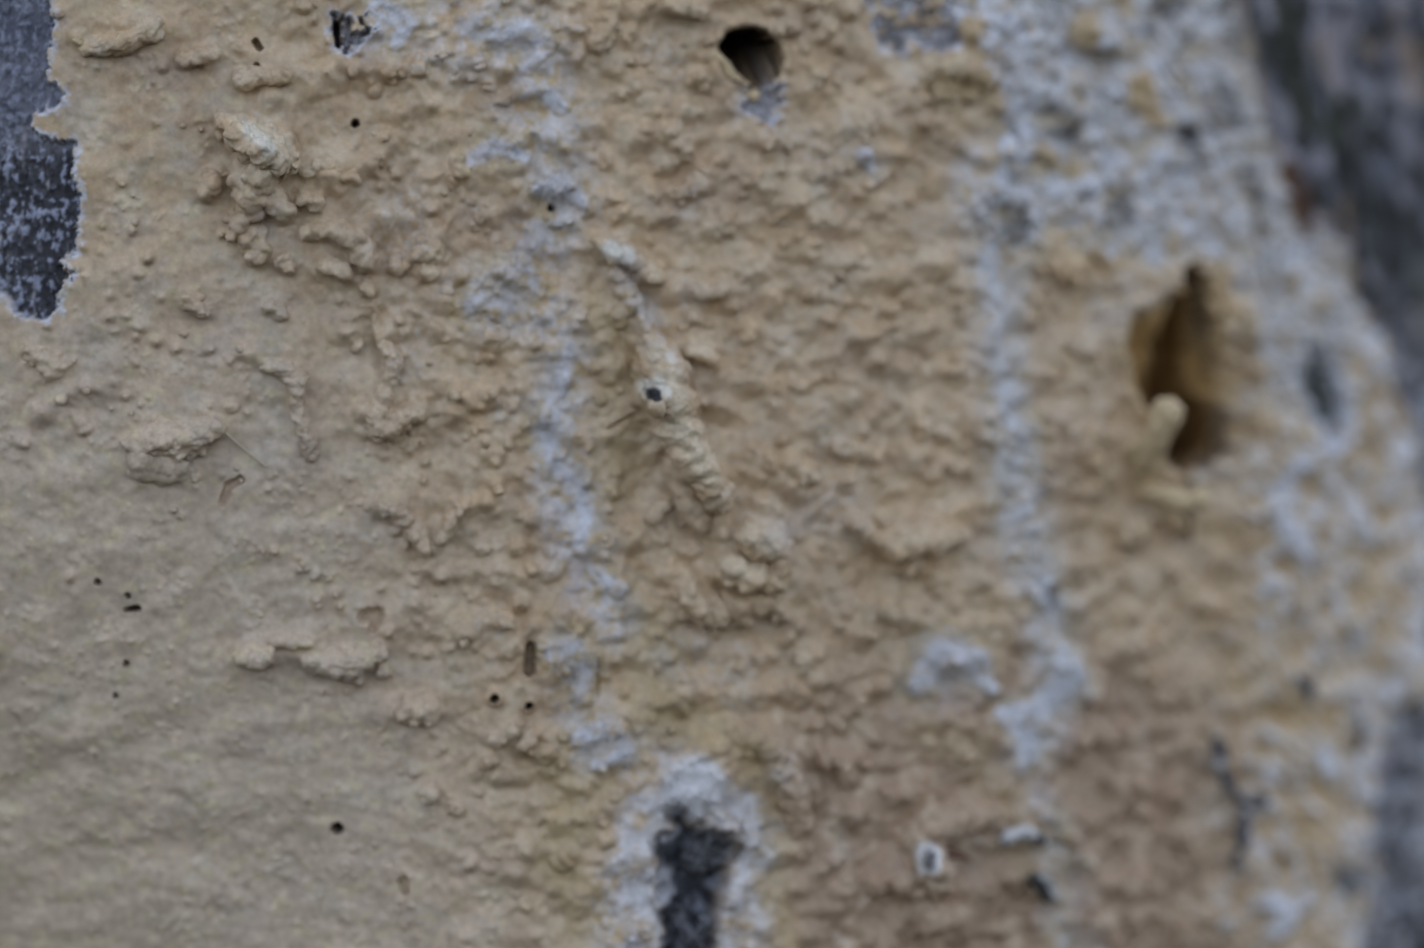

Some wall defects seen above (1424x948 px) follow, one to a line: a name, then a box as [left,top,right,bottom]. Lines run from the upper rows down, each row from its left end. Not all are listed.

peeling [864,0,965,54]
peeling [0,0,82,322]
spalling [1125,266,1235,473]
peeling [675,820,744,878]